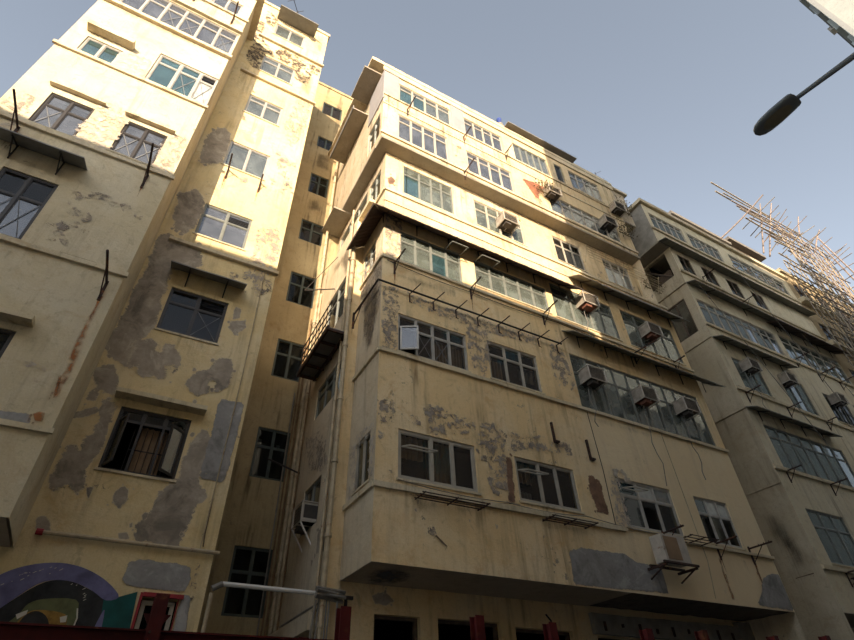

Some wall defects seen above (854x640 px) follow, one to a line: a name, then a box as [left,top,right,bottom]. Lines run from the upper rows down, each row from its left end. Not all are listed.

spalling [246,11,320,83]
peeling [152,135,186,172]
peeling [198,127,231,166]
peeling [270,152,296,194]
peeling [361,214,537,377]
rust [55,296,103,395]
peeling [46,188,207,499]
peeling [184,358,236,404]
peeling [411,404,572,503]